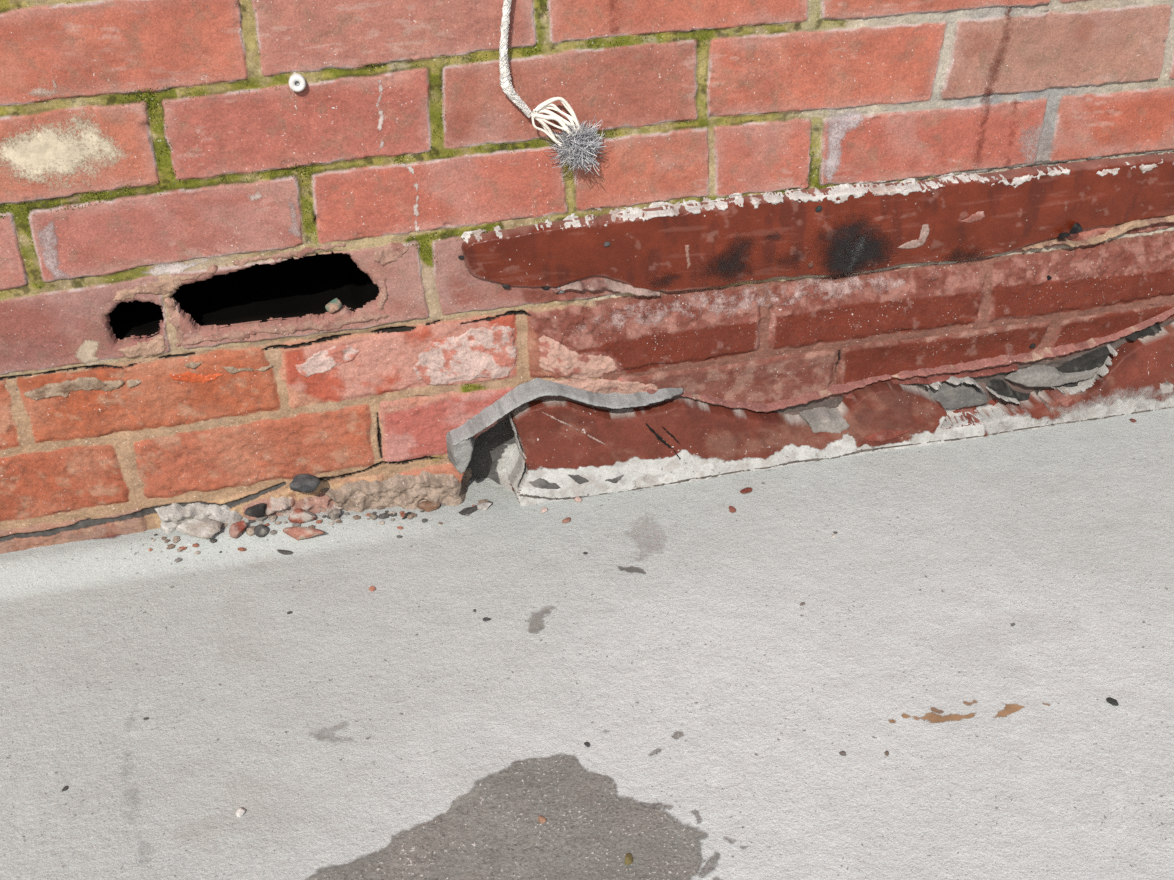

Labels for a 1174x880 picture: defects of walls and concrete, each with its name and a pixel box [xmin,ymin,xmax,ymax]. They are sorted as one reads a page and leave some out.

spalling [1020,215,1174,251]
spalling [109,242,409,359]
spalling [542,278,661,297]
spalling [23,377,142,400]
spalling [169,361,273,383]
spalling [295,345,360,377]
spalling [413,323,517,385]
spalling [537,335,658,394]
peeling [497,381,1174,513]
peeling [459,506,478,515]
leakage [307,754,720,880]